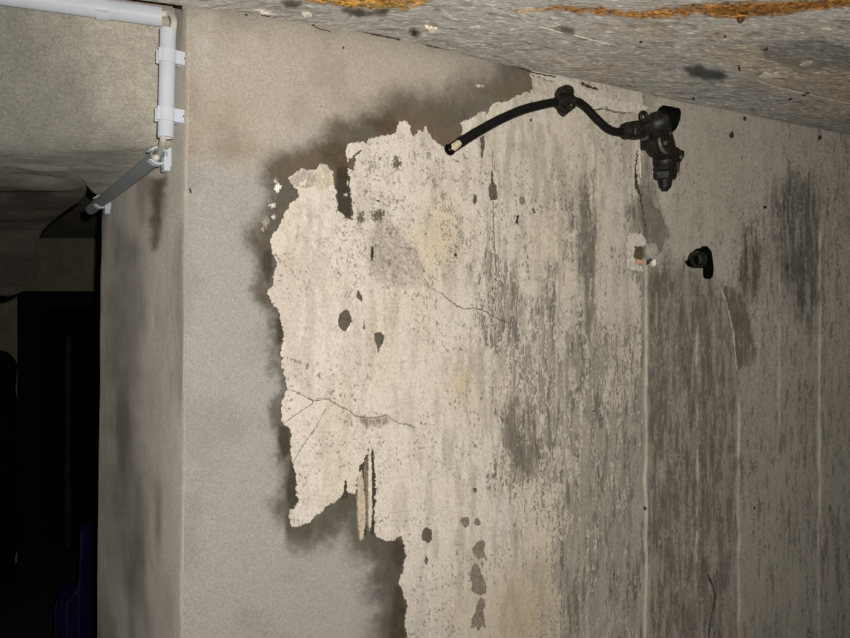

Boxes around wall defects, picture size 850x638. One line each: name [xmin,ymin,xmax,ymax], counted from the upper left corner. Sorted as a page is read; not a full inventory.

rust [305,0,427,10]
rust [514,0,850,19]
crack [379,234,510,324]
leakage [778,185,816,312]
peeling [261,71,648,638]
crack [286,389,414,462]